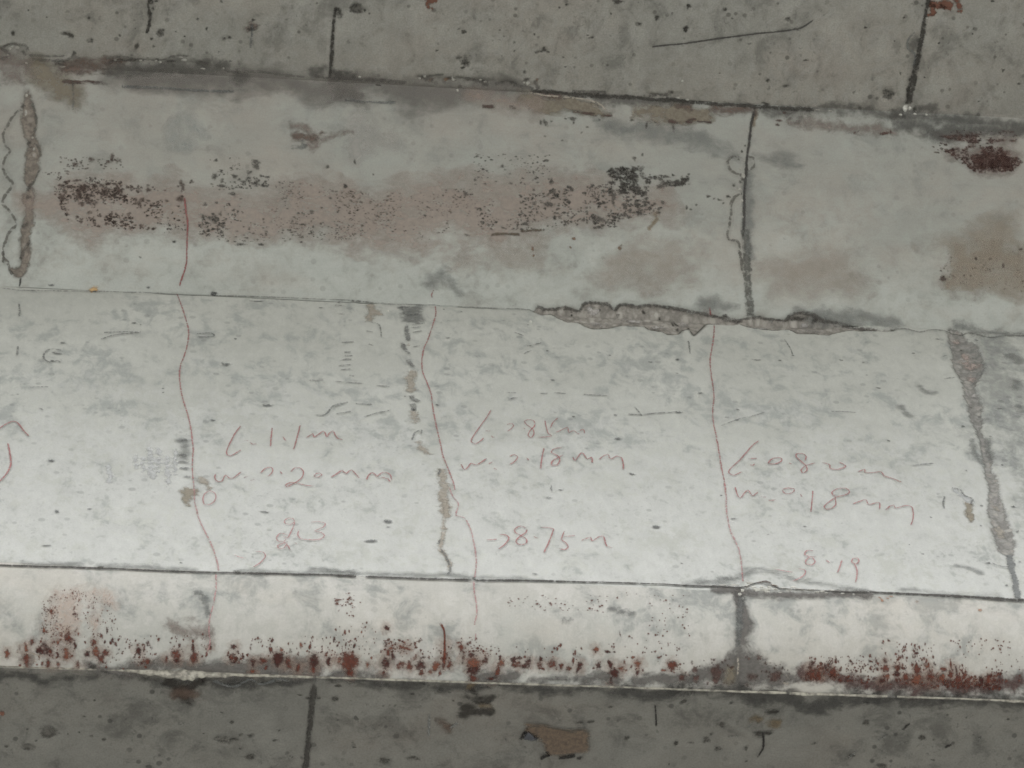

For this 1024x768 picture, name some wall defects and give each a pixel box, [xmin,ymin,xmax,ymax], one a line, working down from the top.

spalling [2,91,41,285]
leakage [45,154,192,243]
leakage [198,153,690,246]
corrosion [932,130,1023,174]
spalling [529,301,892,336]
crack [176,199,219,653]
crack [421,290,478,640]
crack [709,309,744,581]
corrosion [4,589,213,670]
corrosion [163,678,206,705]
corrosion [227,593,735,736]
corrosion [745,638,1024,700]